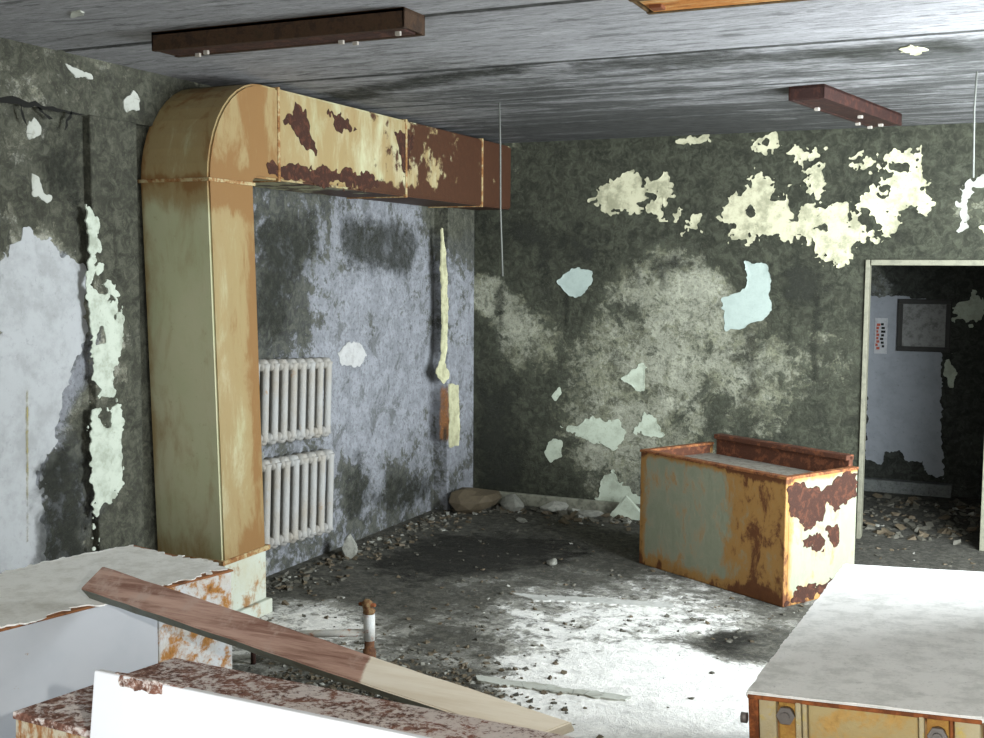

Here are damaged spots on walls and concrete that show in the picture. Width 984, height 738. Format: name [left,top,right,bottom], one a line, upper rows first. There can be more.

crack [0,96,83,130]
corrosion [266,102,379,192]
corrosion [394,130,415,173]
damp [325,66,525,99]
damp [577,40,971,72]
peeling [587,169,703,237]
peeling [716,131,936,268]
damp [341,220,416,273]
peeling [557,267,593,298]
peeling [721,261,772,331]
peeling [0,204,125,574]
damp [39,449,82,562]